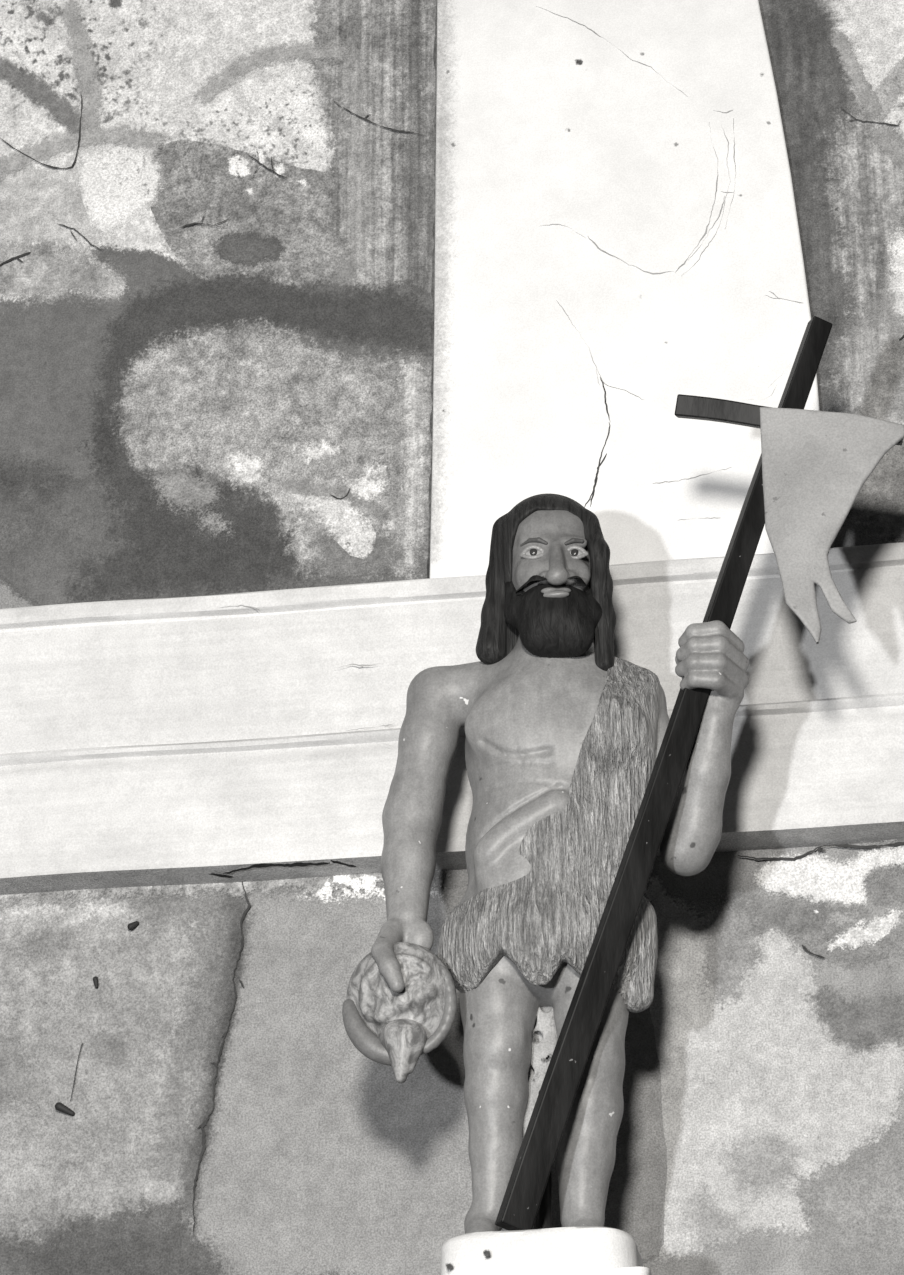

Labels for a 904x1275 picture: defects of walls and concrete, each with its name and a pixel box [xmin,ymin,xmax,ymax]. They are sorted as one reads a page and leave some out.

damp [0,0,434,606]
crack [738,842,904,861]
damp [770,865,904,967]
crack [182,860,356,1232]
damp [809,985,904,1050]
damp [0,1201,220,1275]